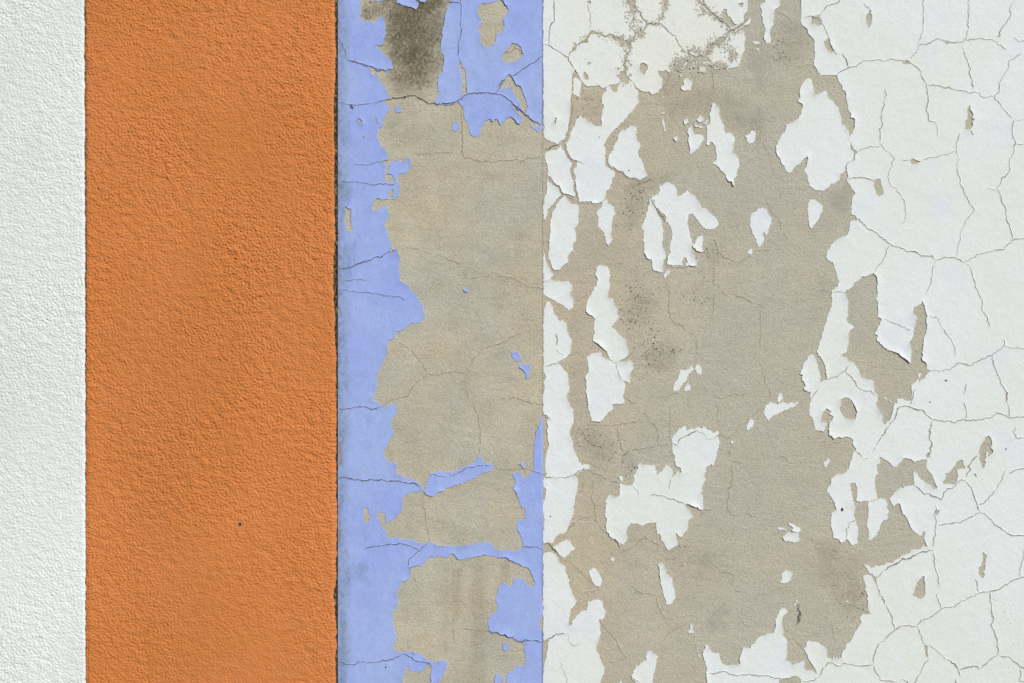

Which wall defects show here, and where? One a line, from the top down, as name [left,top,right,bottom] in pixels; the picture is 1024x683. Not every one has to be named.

peeling [344,206,353,232]
water stain [386,0,443,85]
crack [338,189,804,683]
crack [338,0,811,224]
peeling [359,0,965,683]
crack [775,0,1024,460]
peeling [964,106,974,130]
peeling [978,436,993,468]
crack [710,455,1024,683]
peeling [978,553,987,578]